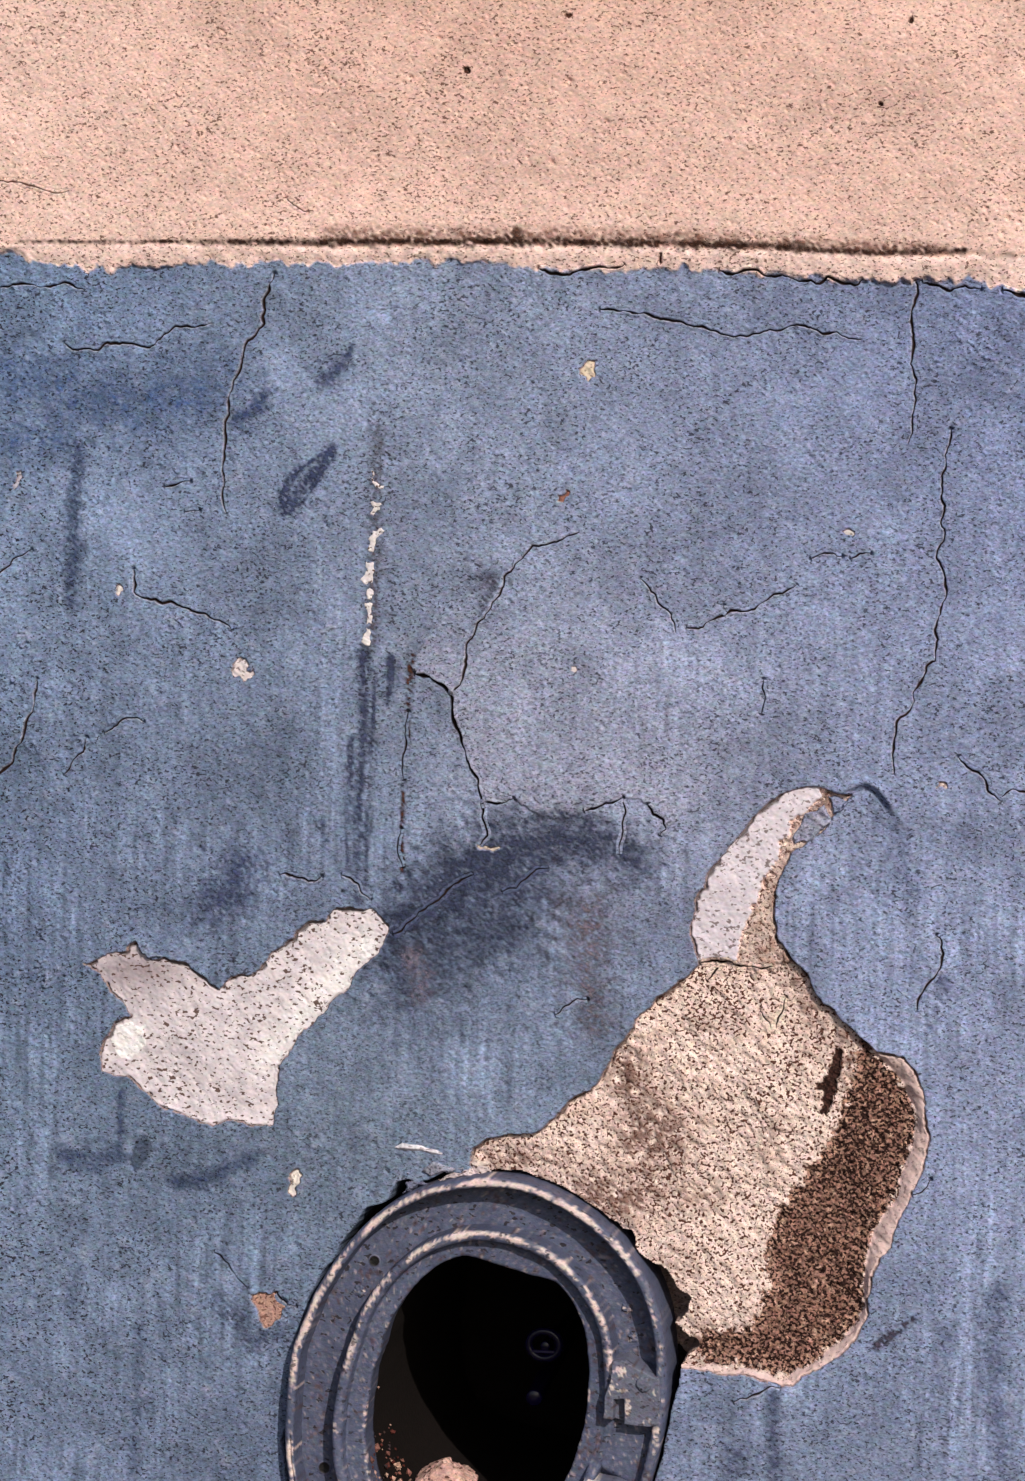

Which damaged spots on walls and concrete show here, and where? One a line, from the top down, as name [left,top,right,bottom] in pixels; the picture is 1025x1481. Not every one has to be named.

crack [63,273,278,515]
leakage [279,445,337,516]
leakage [478,574,500,612]
crack [538,262,865,344]
crack [888,278,1025,774]
peeling [89,907,390,1125]
leakage [317,646,395,865]
crack [393,530,580,937]
leakage [383,809,666,1007]
crack [584,795,670,854]
spalling [395,787,930,1387]
peeling [253,1291,285,1328]